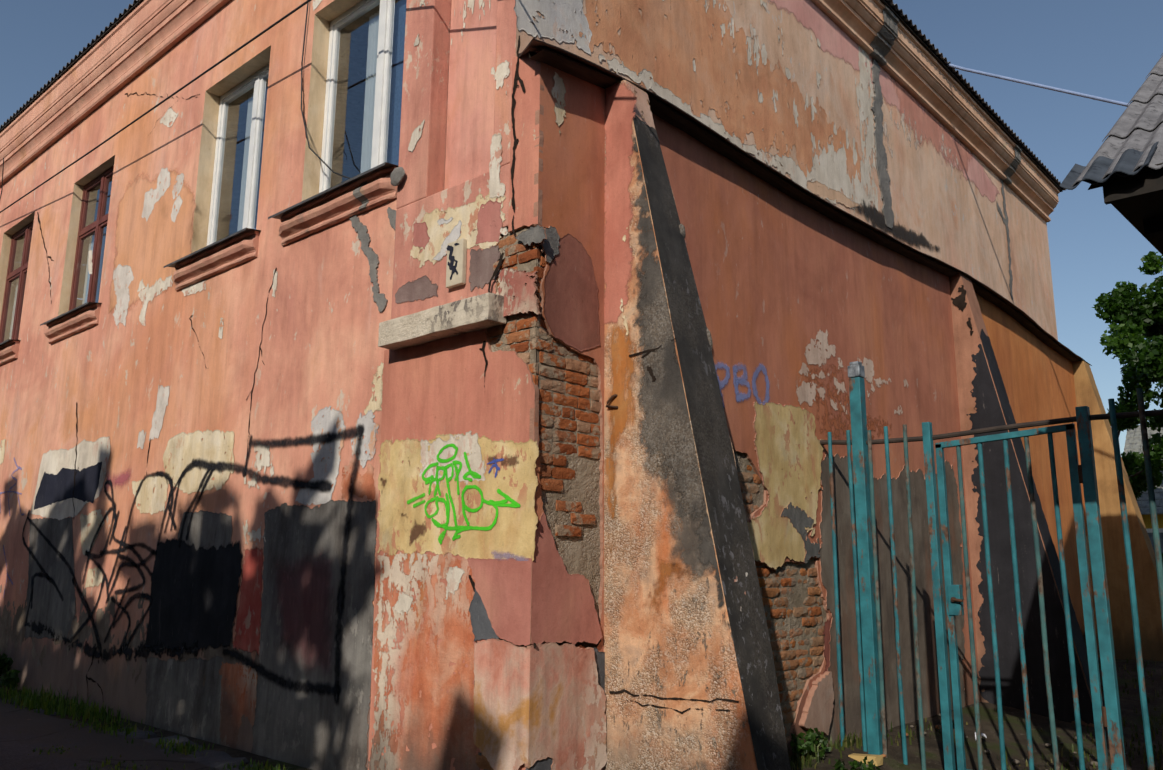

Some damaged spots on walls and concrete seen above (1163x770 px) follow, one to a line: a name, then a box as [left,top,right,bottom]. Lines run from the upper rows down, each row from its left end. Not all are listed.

peeling [160,106,178,127]
crack [488,35,525,293]
peeling [109,167,206,326]
crack [245,268,277,476]
peeling [295,0,1000,770]
crack [476,638,601,648]
crack [609,689,739,714]